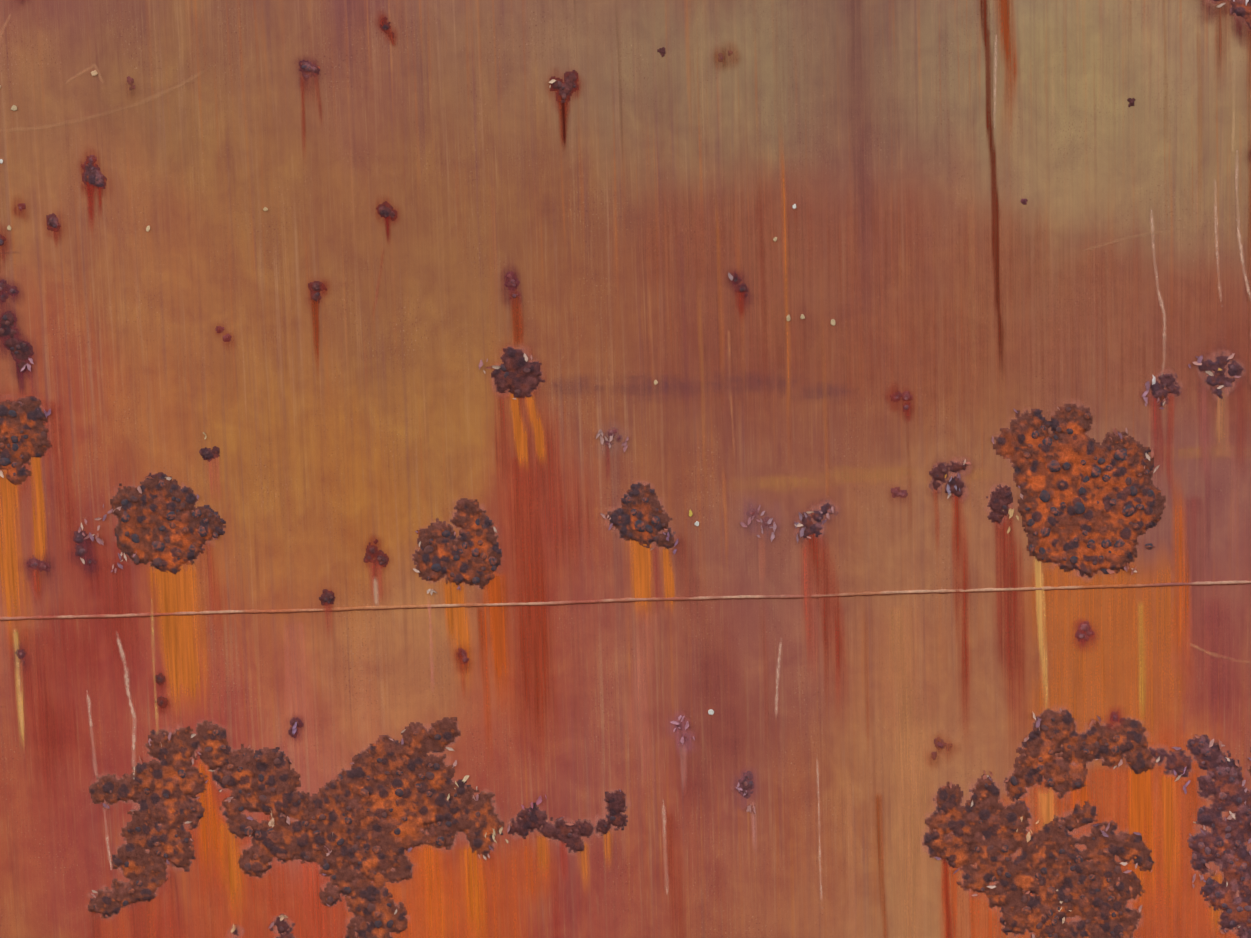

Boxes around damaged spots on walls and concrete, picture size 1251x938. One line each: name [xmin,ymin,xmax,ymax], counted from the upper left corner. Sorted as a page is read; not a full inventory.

rust [981,0,1016,352]
rust [1204,0,1251,61]
rust [0,279,226,735]
rust [412,271,683,725]
rust [986,351,1246,694]
rust [88,717,628,938]
rust [922,708,1251,938]